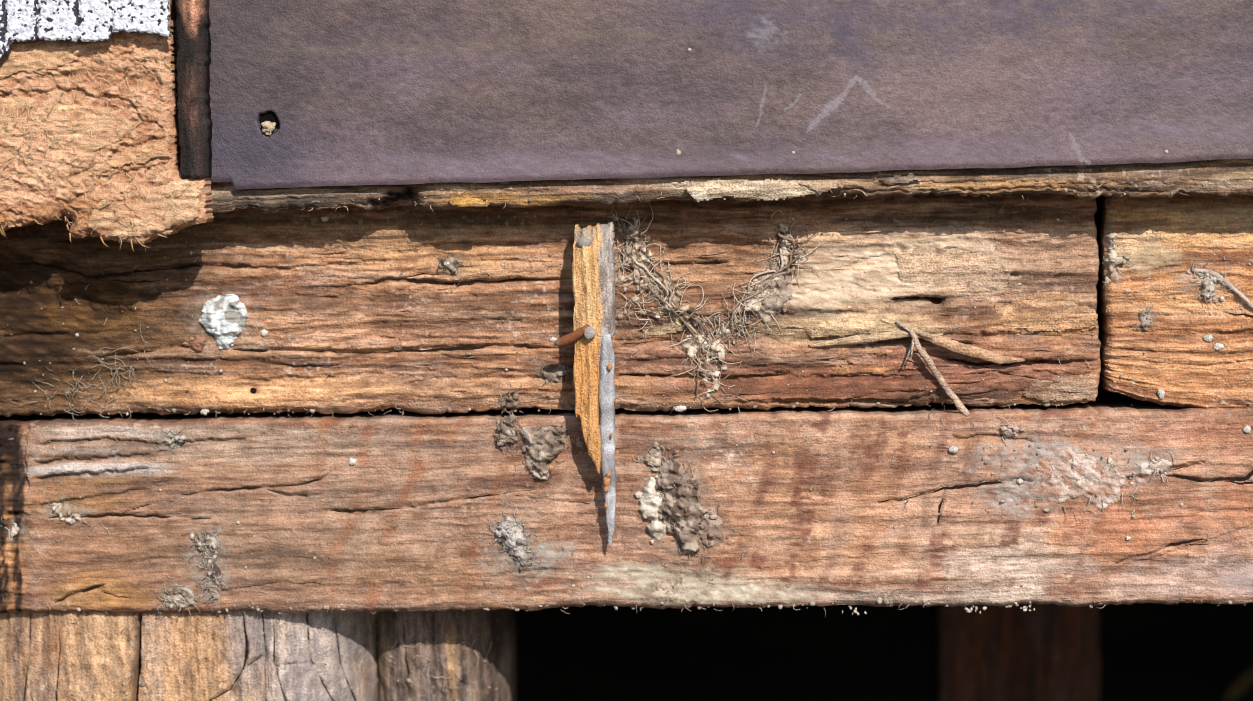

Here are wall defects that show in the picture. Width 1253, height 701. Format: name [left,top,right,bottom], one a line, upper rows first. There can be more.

spalling [0,0,214,252]
crack [1166,464,1253,484]
crack [879,480,1024,538]
crack [1118,539,1223,563]
crack [209,582,356,701]